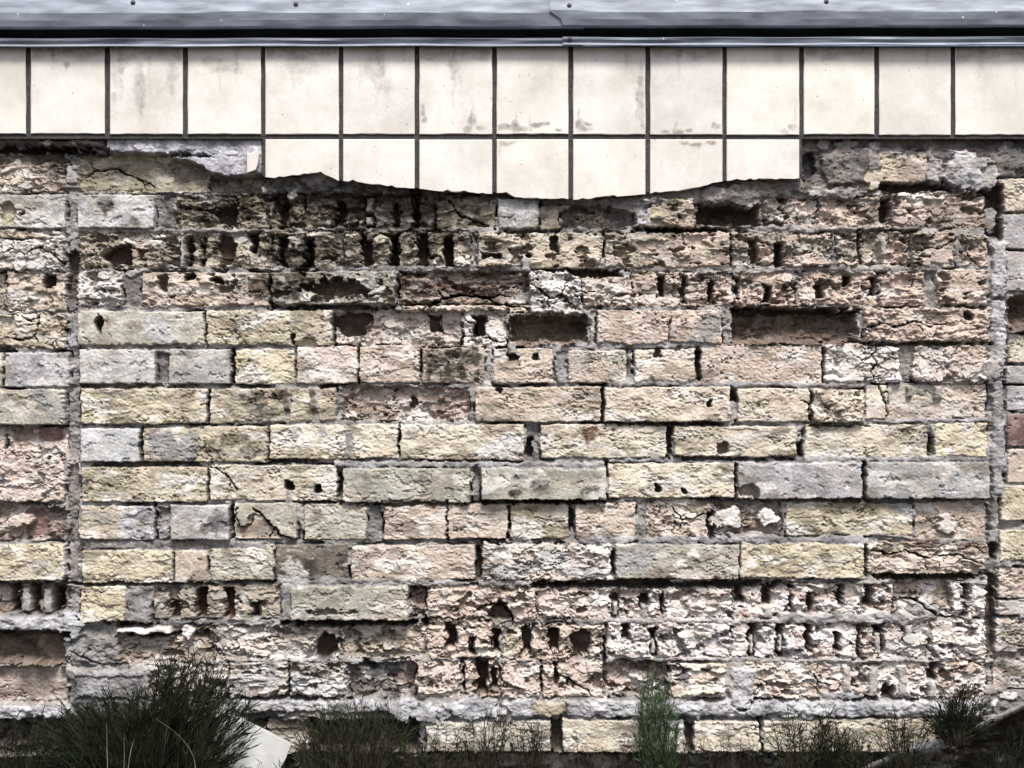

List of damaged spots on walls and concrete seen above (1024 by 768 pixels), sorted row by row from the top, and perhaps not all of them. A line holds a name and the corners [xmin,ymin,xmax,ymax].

crack [89,165,152,186]
spalling [0,139,590,349]
crack [858,321,940,416]
crack [216,467,293,538]
crack [872,549,974,567]
spalling [113,541,990,701]